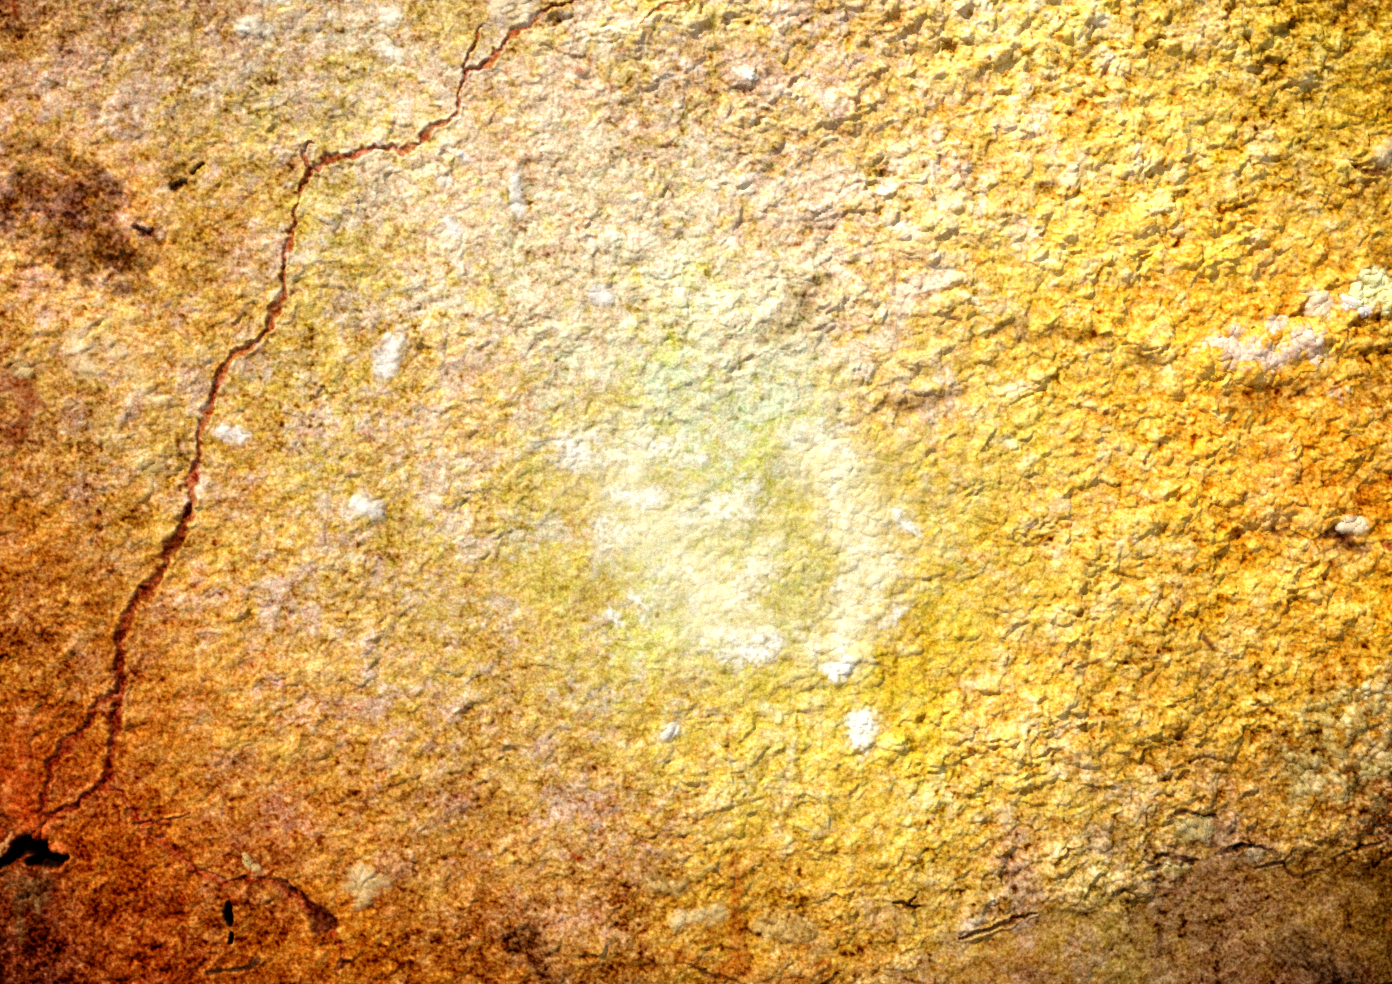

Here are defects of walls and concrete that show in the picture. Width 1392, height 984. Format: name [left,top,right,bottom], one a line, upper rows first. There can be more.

crack [641,0,690,23]
crack [0,0,574,976]
crack [0,935,8,984]
crack [688,964,741,984]